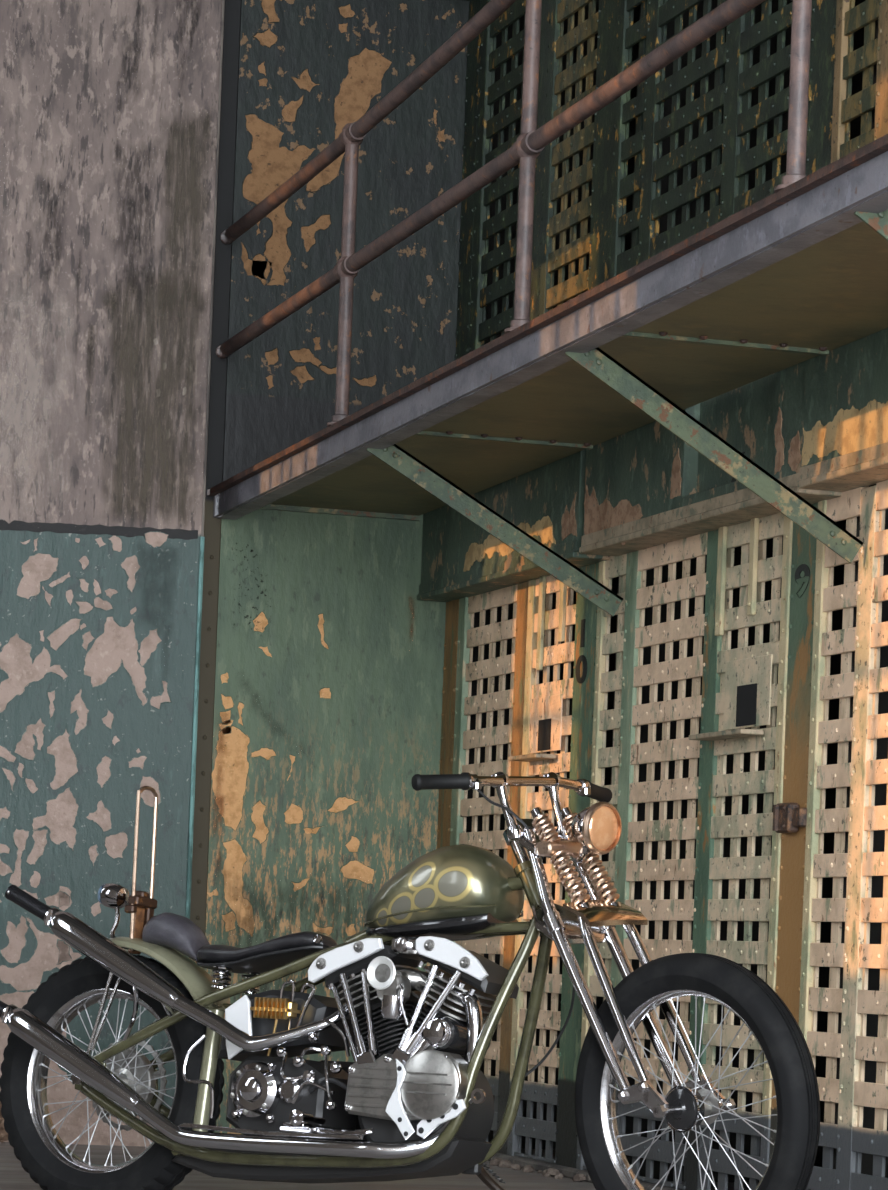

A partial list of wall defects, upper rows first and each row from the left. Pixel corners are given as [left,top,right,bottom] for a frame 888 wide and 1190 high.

peeling [334,47,392,140]
peeling [240,68,331,286]
peeling [264,337,337,389]
peeling [774,399,888,475]
peeling [463,534,514,572]
peeling [517,485,643,544]
peeling [0,535,171,911]
peeling [207,672,296,937]
peeling [340,836,375,885]
peeling [0,915,82,1009]
peeling [0,1018,11,1142]
peeling [47,1060,153,1147]